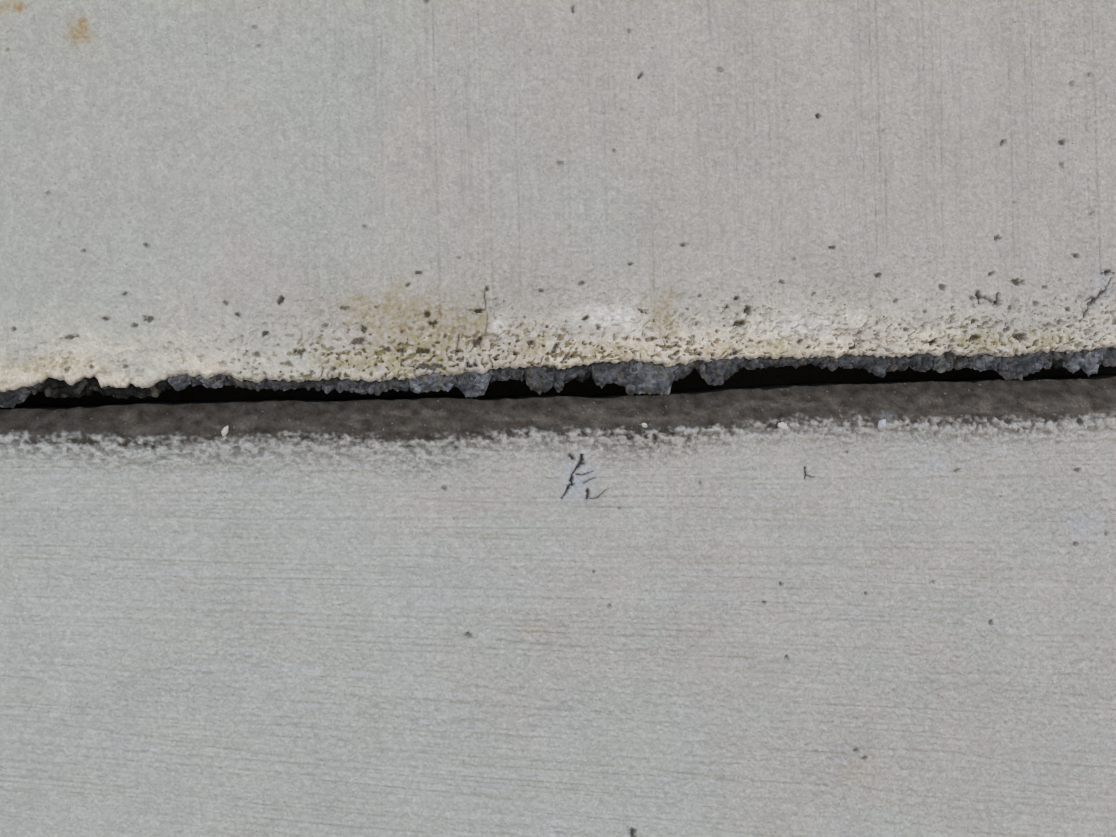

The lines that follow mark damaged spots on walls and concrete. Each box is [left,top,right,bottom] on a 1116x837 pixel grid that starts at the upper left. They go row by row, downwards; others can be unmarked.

spalling [130,315,154,328]
spalling [422,310,447,339]
spalling [722,296,753,328]
spalling [969,290,1013,310]
spalling [1057,269,1115,325]
spalling [0,319,1116,408]
crack [561,452,609,501]